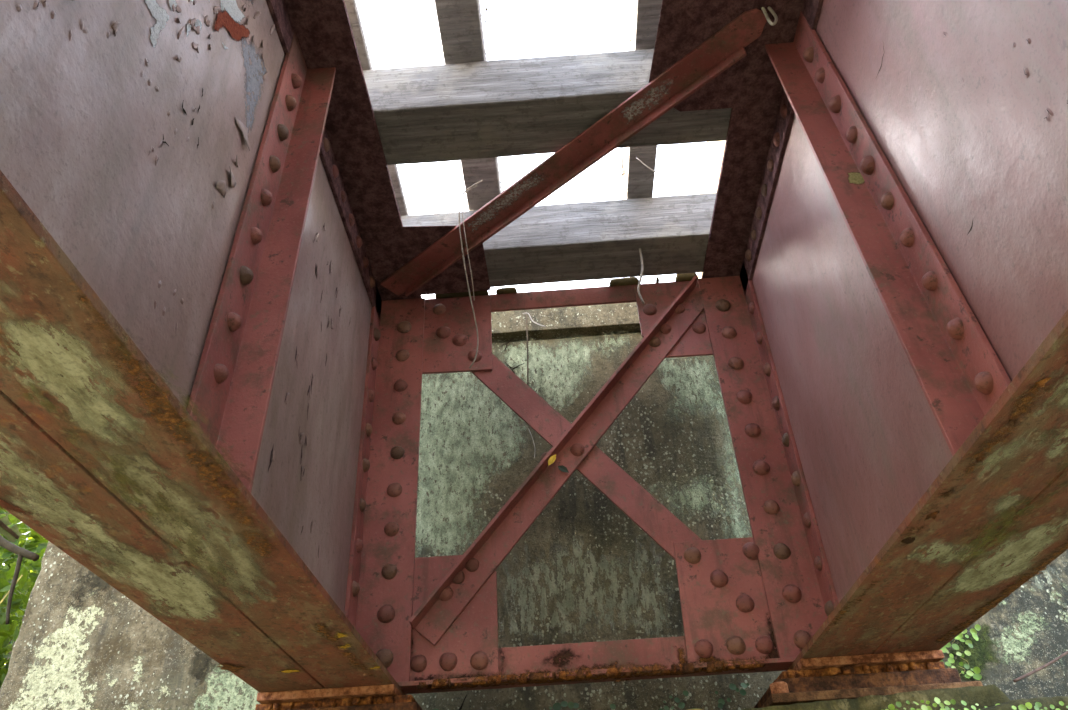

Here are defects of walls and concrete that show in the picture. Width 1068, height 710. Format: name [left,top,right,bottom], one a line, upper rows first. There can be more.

peeling [145,0,275,151]
rust [0,498,30,514]
leakage [0,320,274,621]
leakage [189,647,215,683]